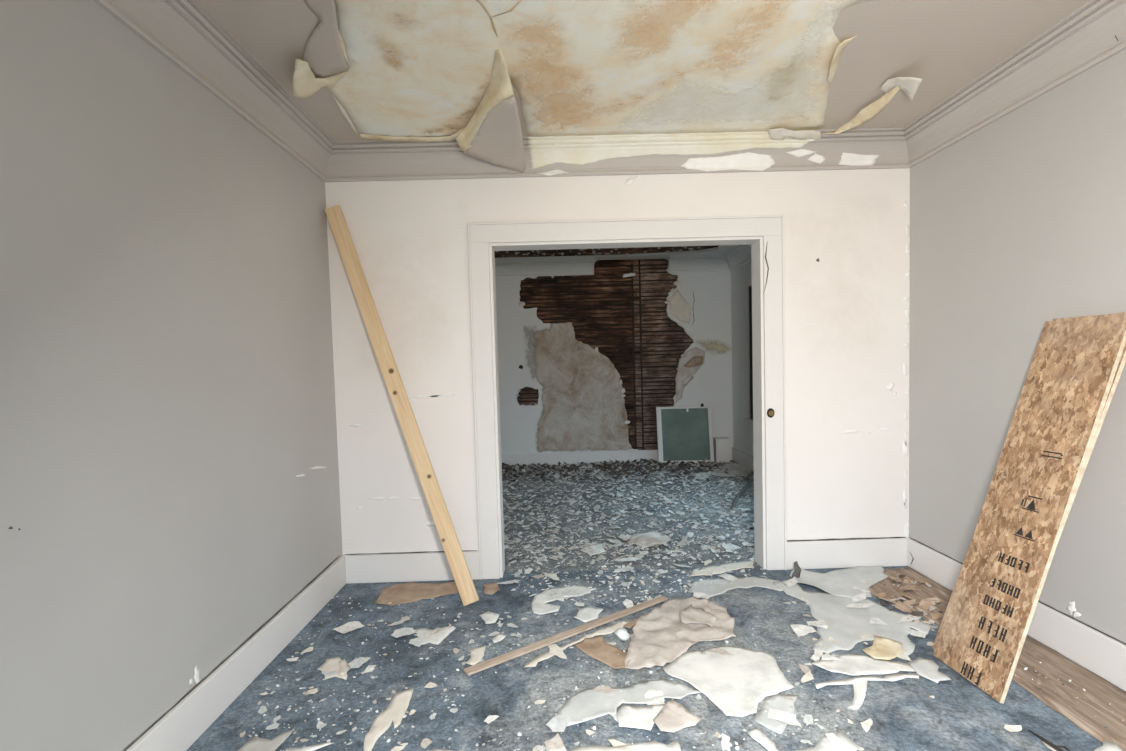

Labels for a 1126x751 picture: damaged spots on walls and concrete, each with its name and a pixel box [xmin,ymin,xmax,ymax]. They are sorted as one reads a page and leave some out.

crack [476,0,522,37]
peeling [293,0,923,176]
flaking render [495,245,719,452]